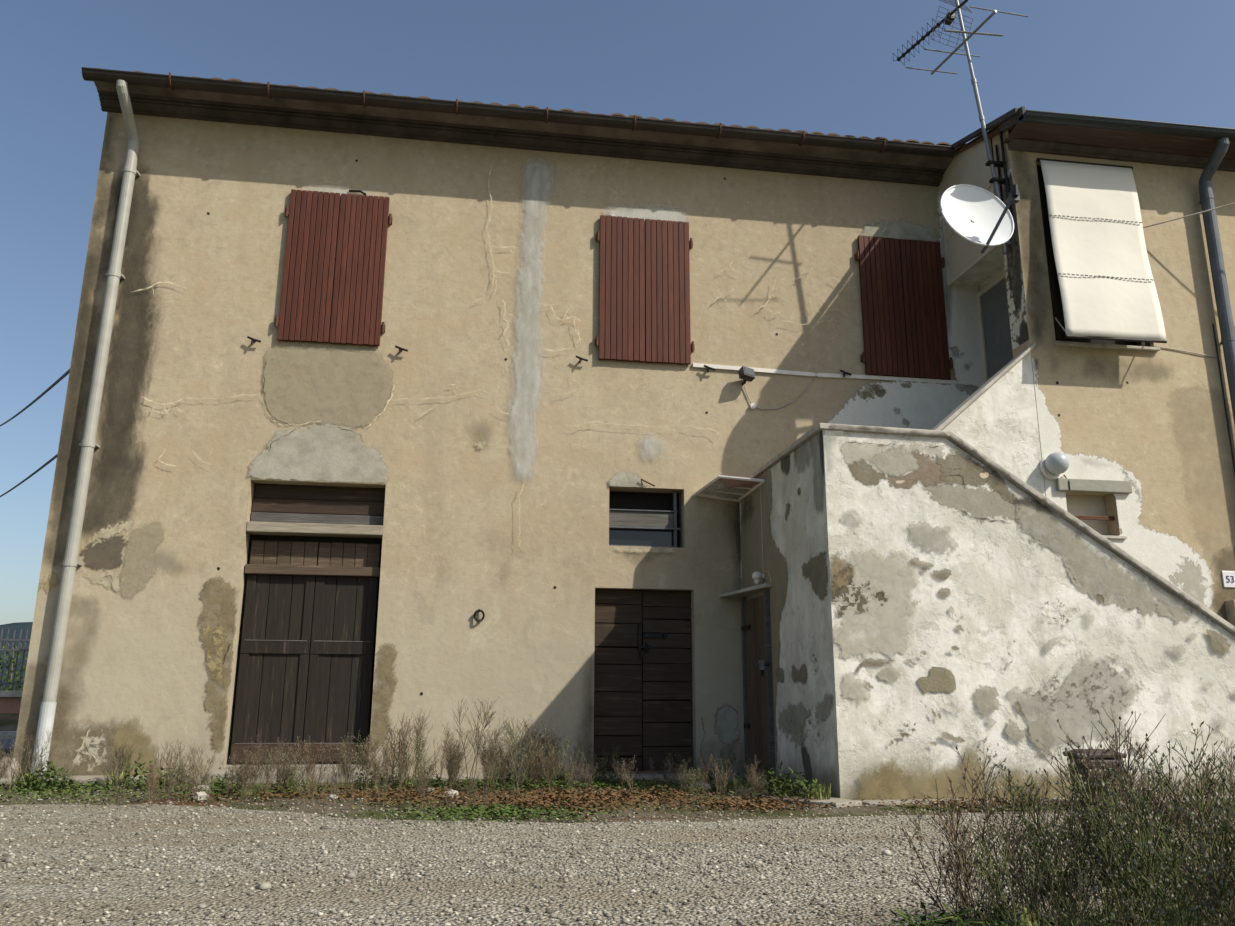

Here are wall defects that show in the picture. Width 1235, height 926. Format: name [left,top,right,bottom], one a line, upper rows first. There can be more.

crack [133,282,185,302]
leakage [37,168,157,594]
crack [143,394,257,415]
peeling [857,384,886,401]
peeling [79,520,134,592]
peeling [841,440,1230,657]
peeling [198,567,237,751]
peeling [740,470,1149,779]
leakage [856,751,1072,800]